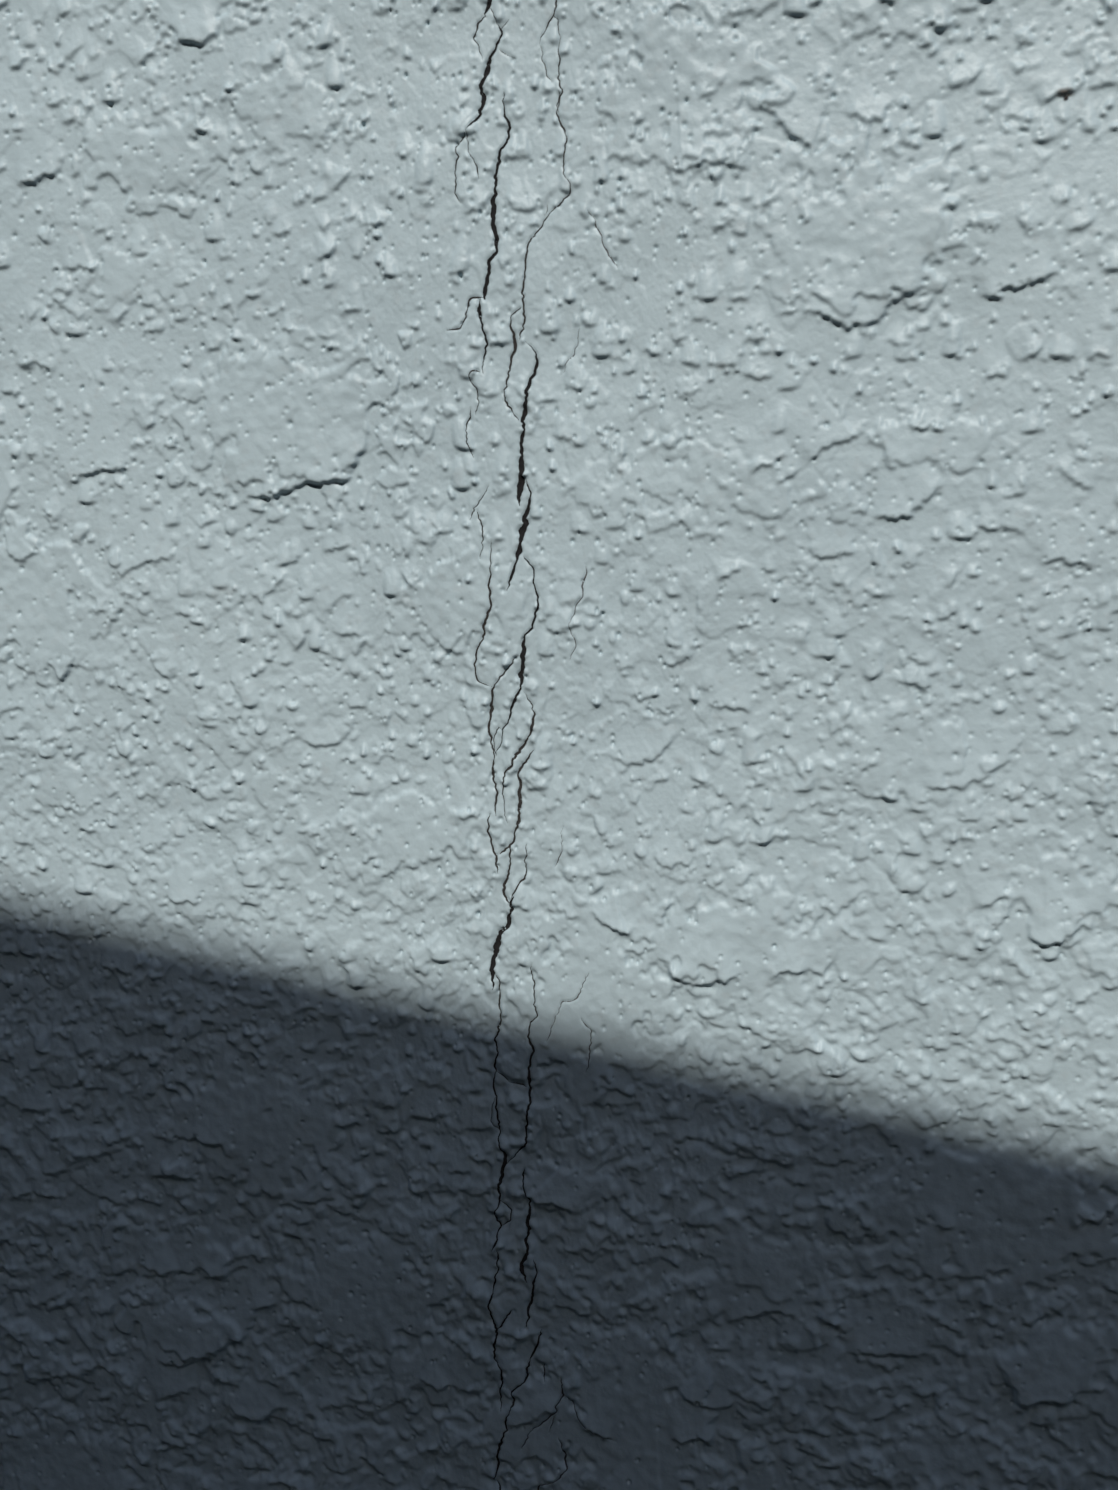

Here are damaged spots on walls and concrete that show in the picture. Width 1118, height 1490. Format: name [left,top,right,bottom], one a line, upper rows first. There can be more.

crack [449,0,618,1490]